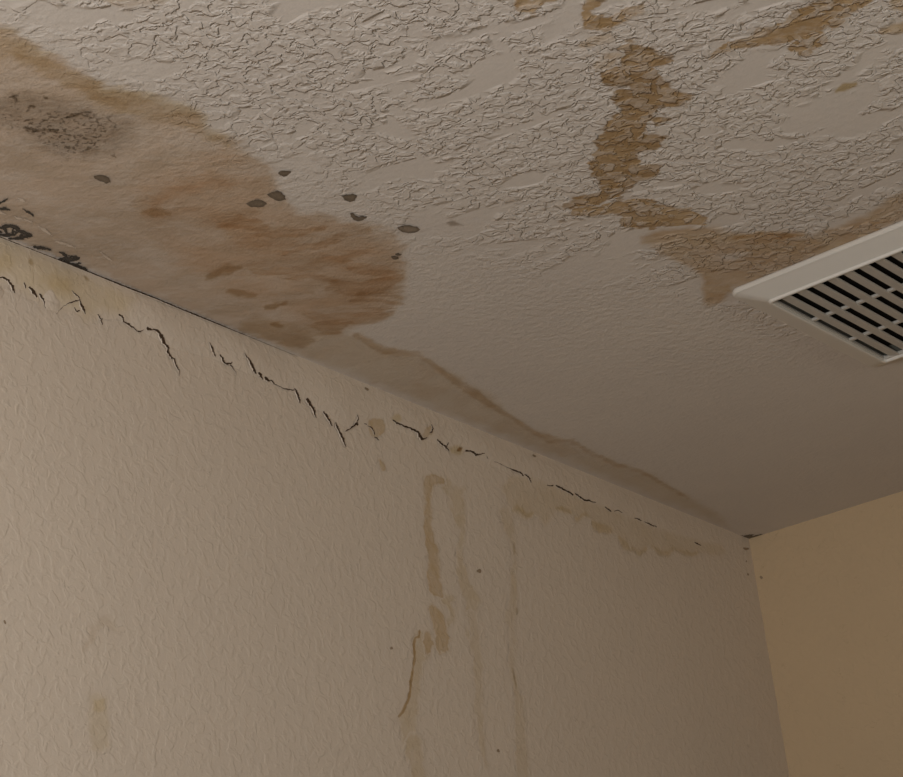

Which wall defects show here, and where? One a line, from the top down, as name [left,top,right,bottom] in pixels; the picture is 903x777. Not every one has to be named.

leakage [0,21,420,356]
leakage [493,0,559,18]
leakage [560,0,903,308]
crack [0,237,657,527]
leakage [396,472,490,777]
leakage [497,473,728,777]